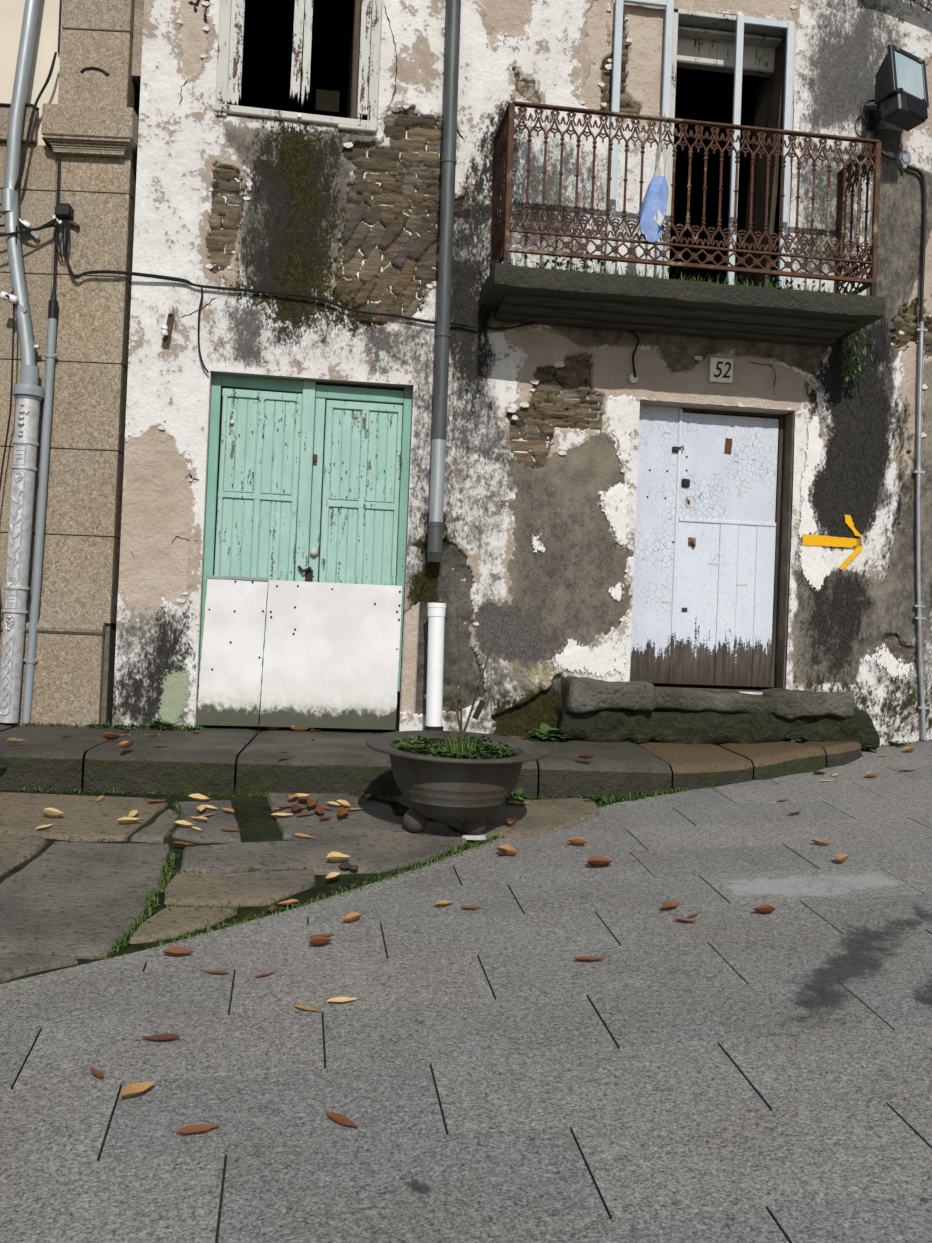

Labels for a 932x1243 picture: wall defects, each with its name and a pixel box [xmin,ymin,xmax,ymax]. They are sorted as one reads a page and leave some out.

peeling [478,0,532,48]
spalling [512,69,541,104]
leakage [796,0,910,153]
flaking render [205,163,251,274]
leakage [223,119,352,368]
flaking render [333,105,469,330]
leakage [361,327,396,378]
peeling [890,204,932,583]
peeling [415,329,814,721]
leakage [789,317,927,682]
leakage [112,601,197,728]
leakage [796,908,932,1021]